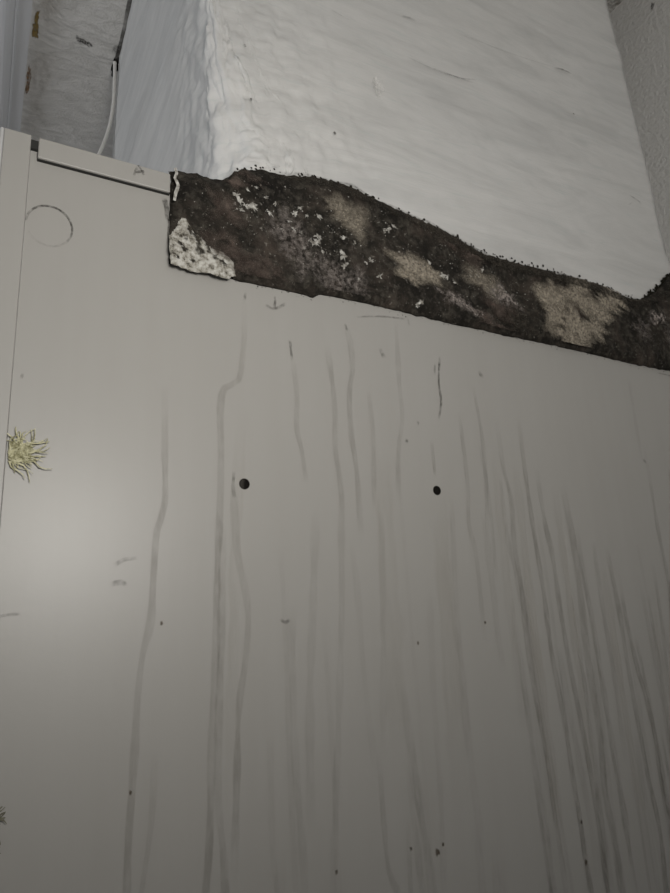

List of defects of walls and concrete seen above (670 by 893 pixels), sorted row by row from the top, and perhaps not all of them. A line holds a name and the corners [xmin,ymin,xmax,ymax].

water stain [168,165,670,372]